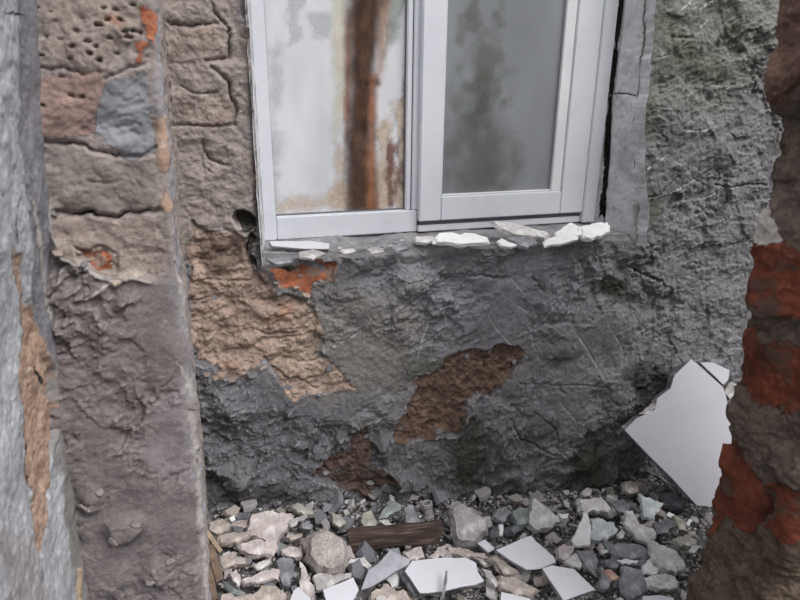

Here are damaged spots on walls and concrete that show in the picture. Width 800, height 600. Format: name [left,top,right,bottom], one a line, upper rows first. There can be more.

spalling [37,0,228,139]
corrosion [278,0,404,211]
crack [599,0,638,221]
spalling [11,187,357,553]
spalling [312,426,399,497]
spalling [393,344,525,445]
spalling [621,326,800,545]
flaking render [745,240,800,320]